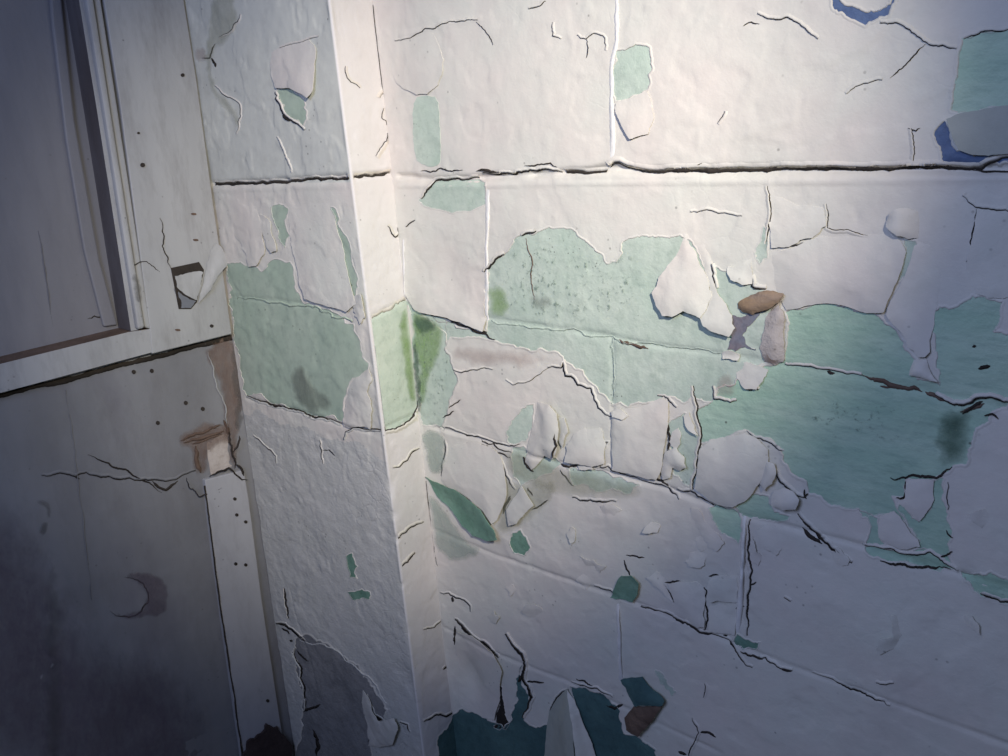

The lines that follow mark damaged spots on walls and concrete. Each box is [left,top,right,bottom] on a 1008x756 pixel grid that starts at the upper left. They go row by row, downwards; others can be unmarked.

peeling [392,33,444,167]
crack [528,0,609,58]
peeling [613,42,655,139]
crack [744,10,819,39]
crack [844,18,1008,94]
peeling [930,30,1008,174]
crack [388,128,1008,262]
peeling [198,177,1008,606]
crack [42,420,277,497]
crack [398,313,894,724]
spalling [290,633,398,756]
peeling [436,664,664,756]